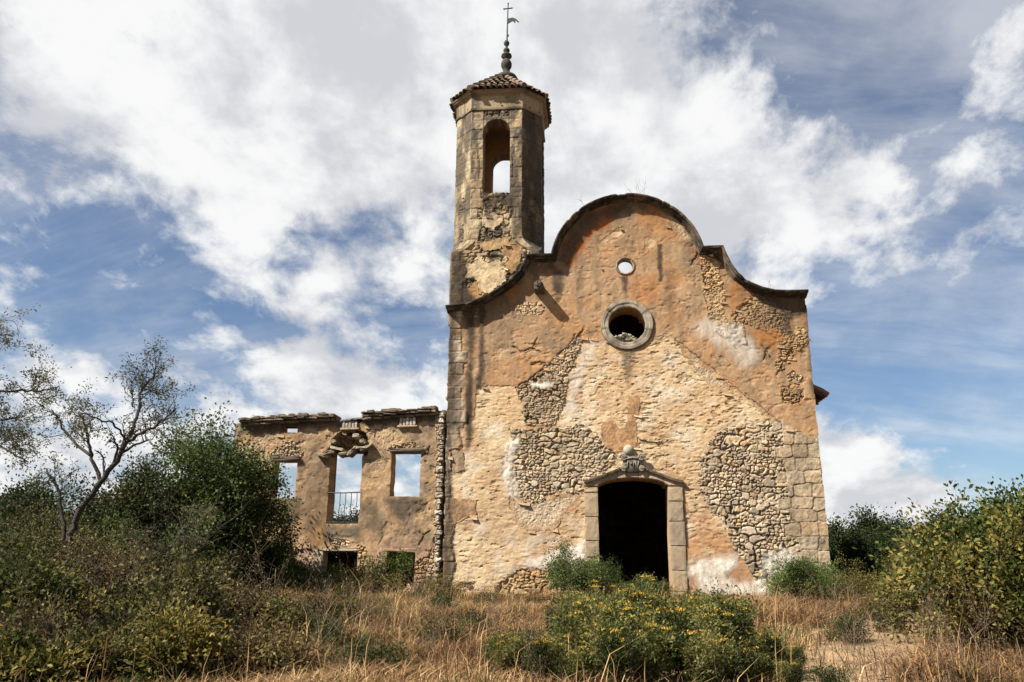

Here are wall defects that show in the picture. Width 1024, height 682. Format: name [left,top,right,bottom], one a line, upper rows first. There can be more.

flaking render [465,212,523,300]
flaking render [515,302,546,316]
flaking render [700,254,812,405]
flaking render [337,422,423,472]
flaking render [414,331,831,599]
leakage [690,551,792,596]